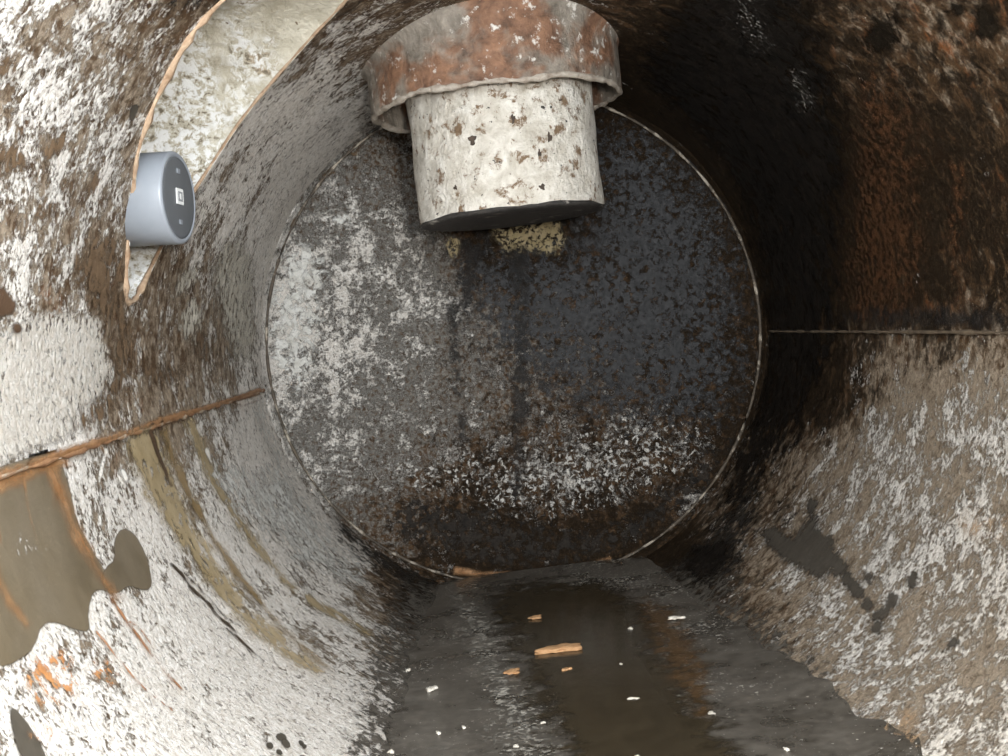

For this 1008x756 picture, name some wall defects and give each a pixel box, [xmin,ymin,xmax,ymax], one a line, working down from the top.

rust [0,388,261,486]
peeling [0,311,152,666]
crack [170,563,256,657]
damp [127,429,327,674]
damp [184,398,564,756]
peeling [759,499,899,634]
peeling [907,571,918,589]
rust [26,650,77,706]
spalling [266,733,307,756]